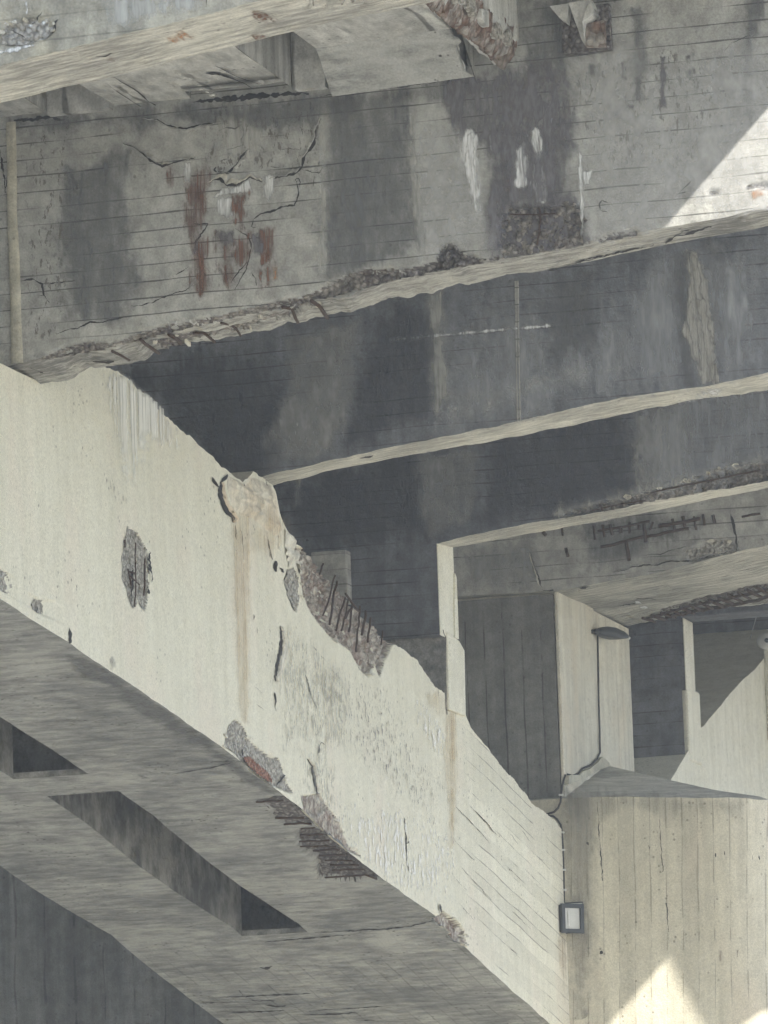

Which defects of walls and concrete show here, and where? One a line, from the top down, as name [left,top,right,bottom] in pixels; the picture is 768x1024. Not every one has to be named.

spalling [426,0,517,70]
crack [96,53,332,289]
rust [184,171,276,297]
spalling [42,201,588,361]
damp [442,0,592,256]
spalling [121,526,153,611]
crack [212,474,284,573]
spalling [284,547,392,676]
spalling [560,463,768,561]
spalling [635,584,768,623]
spalling [222,720,377,882]